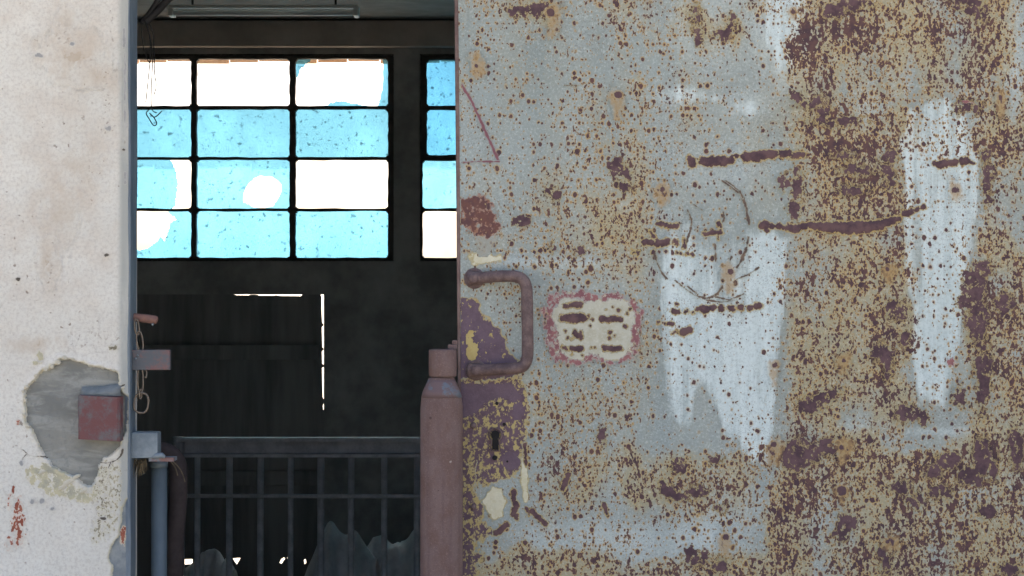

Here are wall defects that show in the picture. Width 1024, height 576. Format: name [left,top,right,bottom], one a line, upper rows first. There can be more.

corrosion [505,0,565,42]
corrosion [461,193,533,257]
corrosion [630,179,696,258]
corrosion [685,148,929,236]
corrosion [931,148,998,212]
corrosion [656,259,765,338]
corrosion [949,258,1018,420]
corrosion [4,486,27,552]
spalling [15,349,127,576]
peeling [461,296,549,576]
corrosion [656,457,735,575]
corrosion [886,422,1024,522]